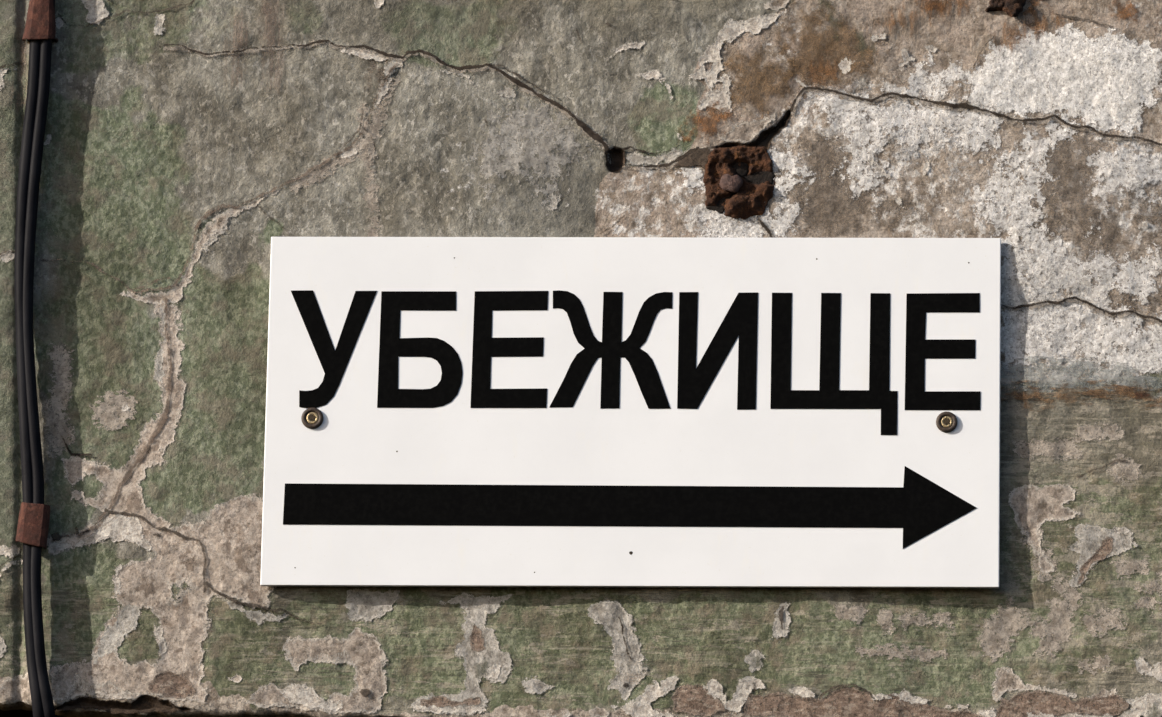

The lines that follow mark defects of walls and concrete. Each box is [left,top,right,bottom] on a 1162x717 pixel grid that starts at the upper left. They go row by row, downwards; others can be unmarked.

crack [58,0,195,27]
spalling [1003,0,1023,17]
crack [1054,13,1113,27]
peeling [689,0,789,143]
crack [42,36,1162,305]
spalling [732,162,775,185]
spalling [706,192,736,214]
crack [1001,297,1162,326]
peeling [1012,422,1124,461]
spalling [587,484,1162,717]